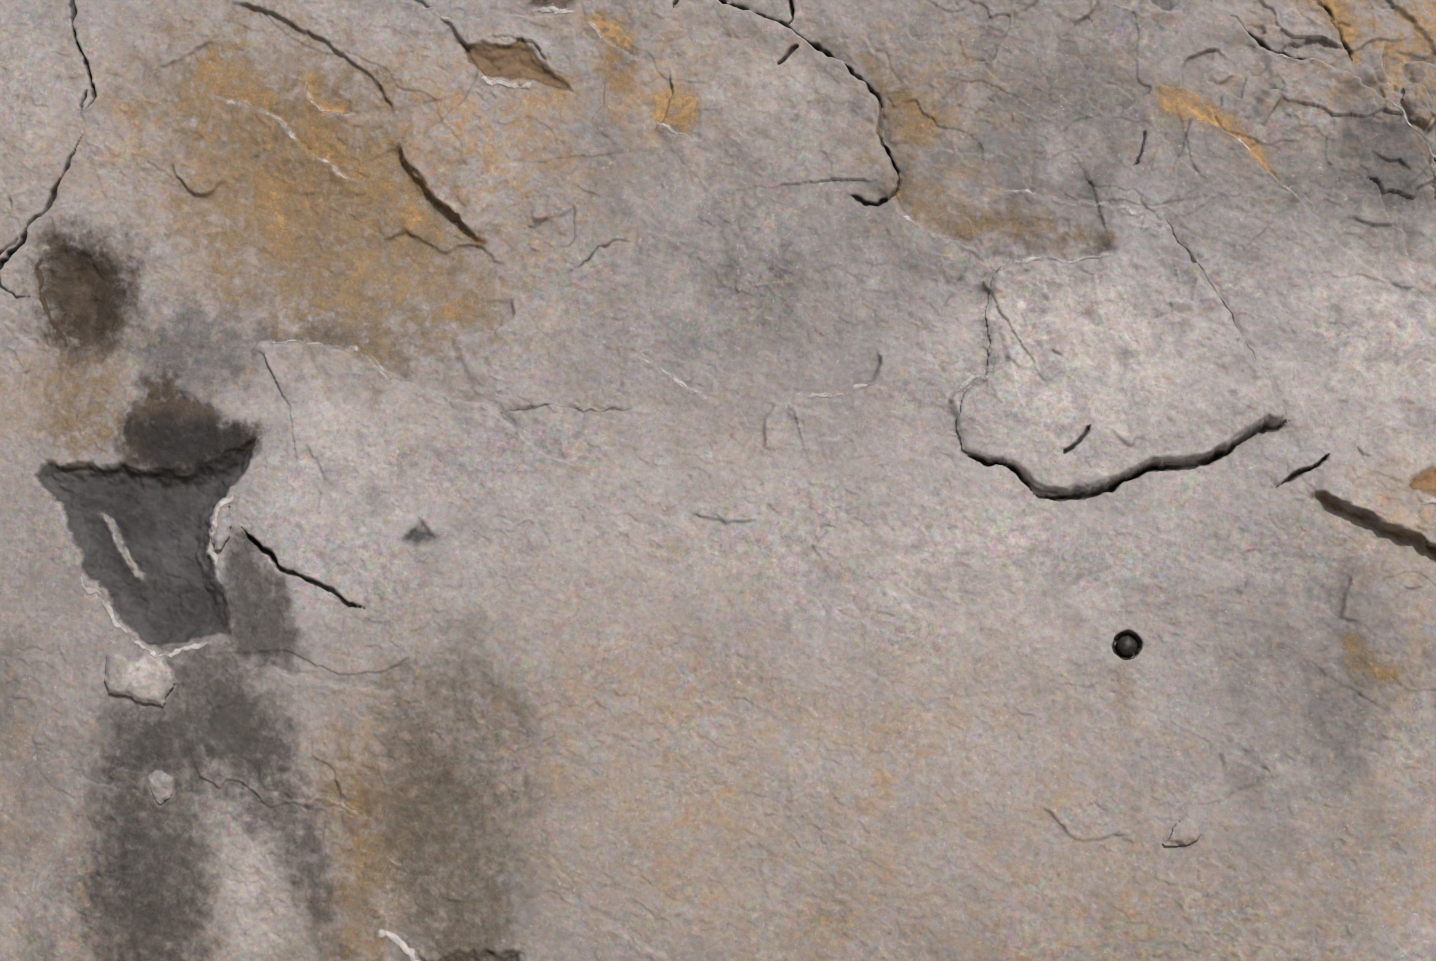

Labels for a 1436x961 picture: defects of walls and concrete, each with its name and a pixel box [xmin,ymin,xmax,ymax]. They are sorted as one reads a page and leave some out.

rust [1310,0,1361,63]
crack [0,1,96,298]
rust [168,15,493,364]
crack [851,145,900,206]
rust [1159,85,1280,182]
leakage [35,231,139,364]
crack [969,444,1238,500]
spalling [37,450,252,706]
crack [241,526,365,609]
leakage [90,533,332,961]
spalling [378,929,420,961]
spalling [444,950,519,961]